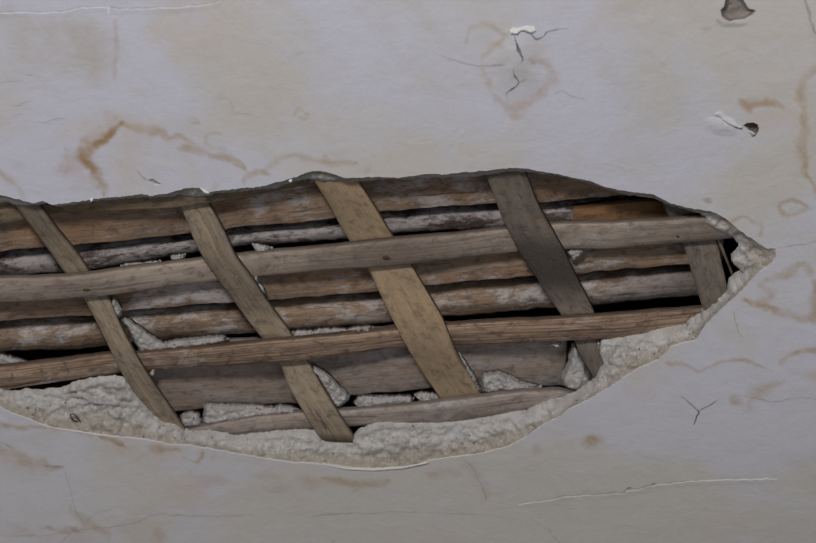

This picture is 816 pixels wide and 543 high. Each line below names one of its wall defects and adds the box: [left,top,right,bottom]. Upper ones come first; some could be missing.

flaking render [721,0,755,22]
crack [800,0,816,48]
crack [510,26,536,48]
flaking render [714,112,759,137]
flaking render [0,168,776,471]